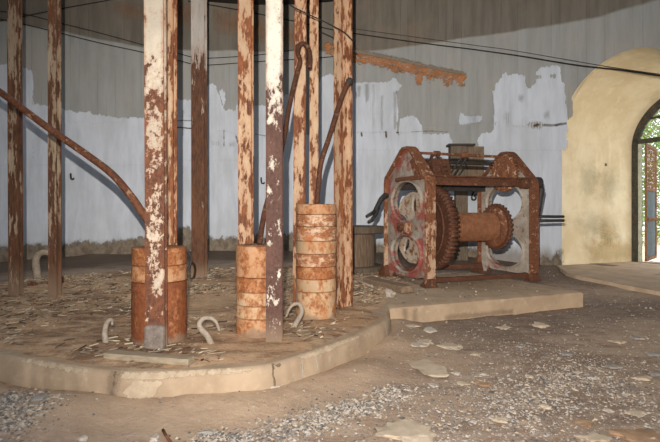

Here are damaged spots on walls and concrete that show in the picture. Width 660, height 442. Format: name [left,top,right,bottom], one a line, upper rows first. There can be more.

peeling [0,63,8,166]
peeling [22,66,34,119]
peeling [177,99,191,161]
peeling [207,83,238,161]
peeling [254,105,266,158]
peeling [283,94,294,159]
peeling [319,74,334,159]
rust [352,49,466,87]
peeling [352,59,573,151]
crack [271,363,281,389]